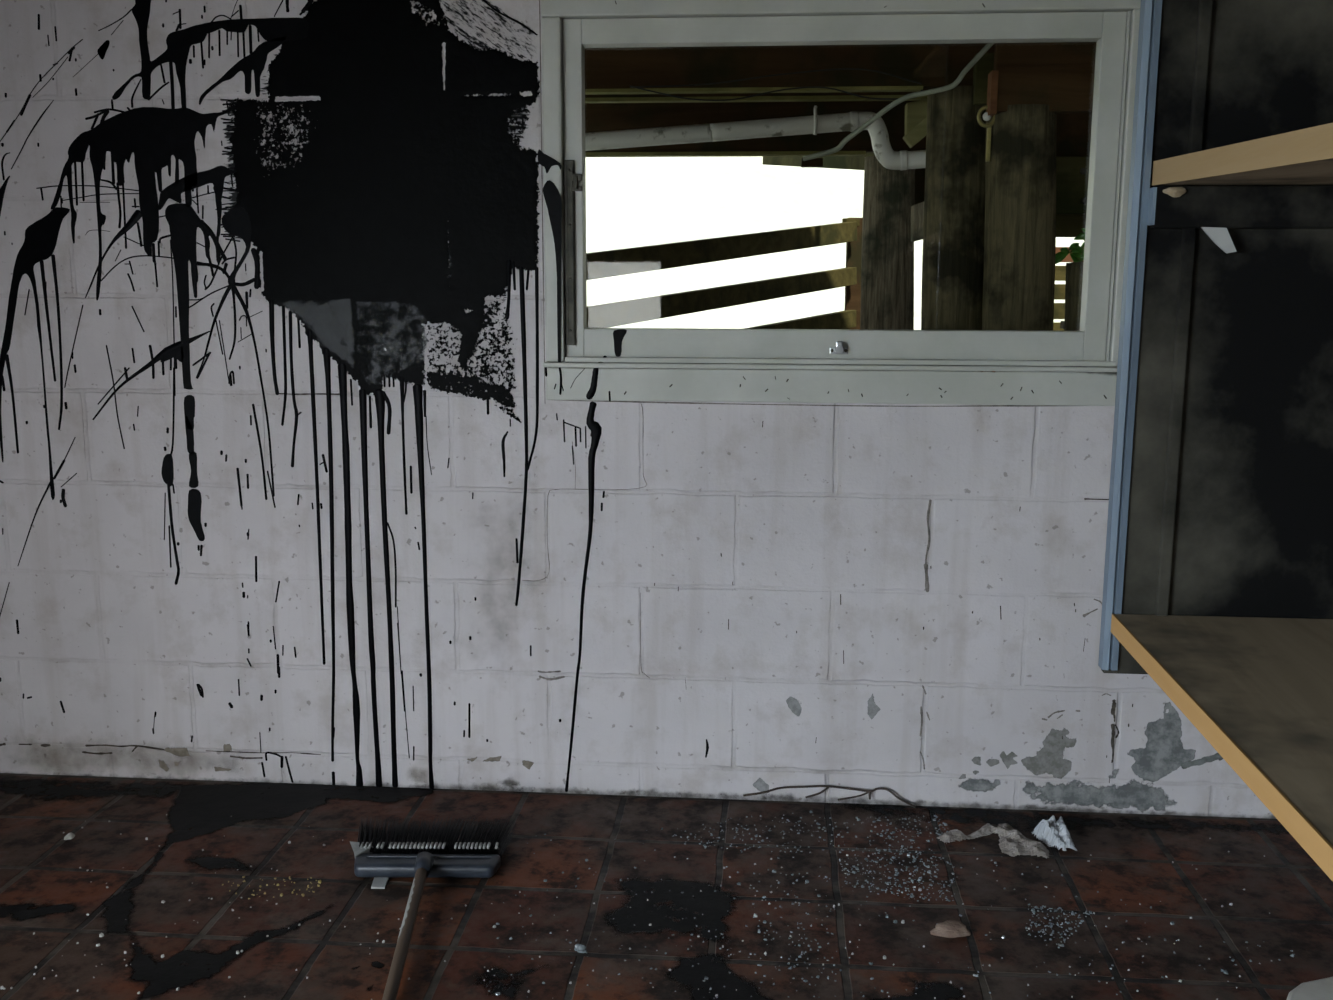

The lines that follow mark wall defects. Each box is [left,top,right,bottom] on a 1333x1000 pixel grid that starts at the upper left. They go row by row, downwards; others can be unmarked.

crack [924,500,932,592]
peeling [786,696,802,716]
peeling [868,693,880,719]
crack [1042,693,1119,763]
peeling [959,702,1223,812]